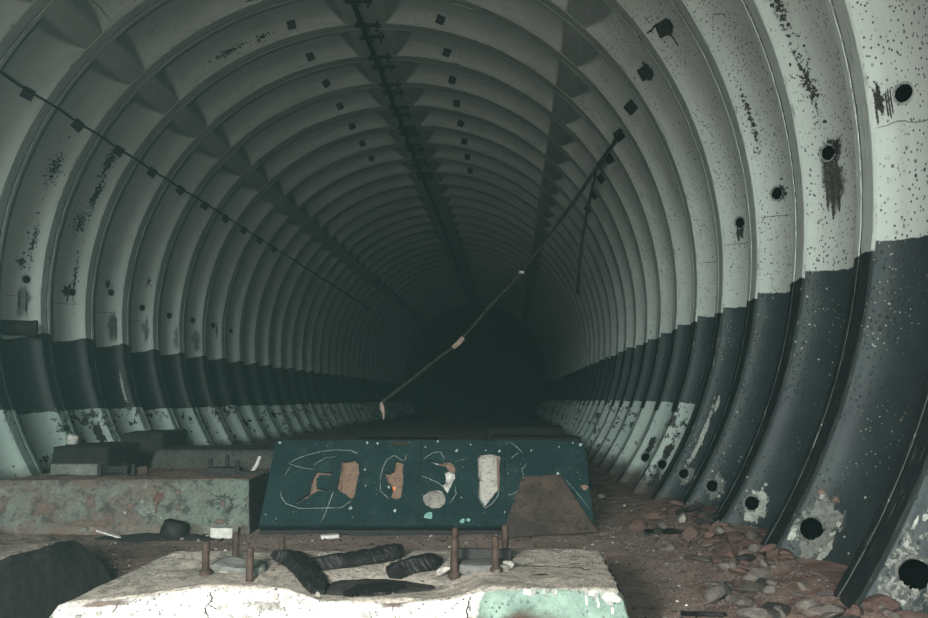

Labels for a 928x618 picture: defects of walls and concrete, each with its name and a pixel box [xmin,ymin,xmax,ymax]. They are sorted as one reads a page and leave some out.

spalling [92,423,107,442]
spalling [640,437,673,490]
peeling [677,396,720,486]
peeling [705,470,727,502]
spalling [743,483,769,524]
spalling [787,490,847,560]
spalling [873,509,928,611]
crack [204,592,217,618]